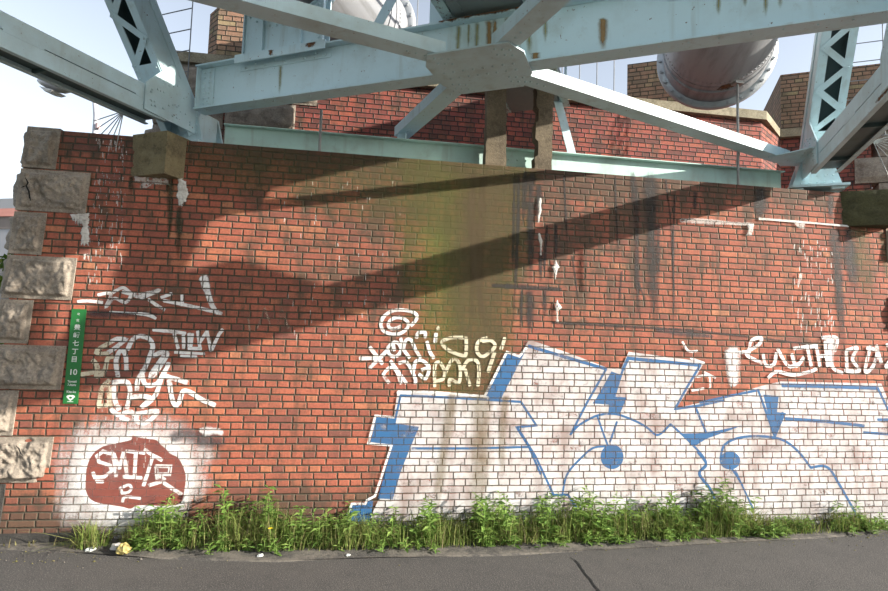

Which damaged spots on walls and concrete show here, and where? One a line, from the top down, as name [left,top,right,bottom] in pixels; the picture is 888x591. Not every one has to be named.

corrosion [439,7,519,49]
leakage [70,171,189,269]
leakage [492,172,824,347]
leakage [692,188,865,330]